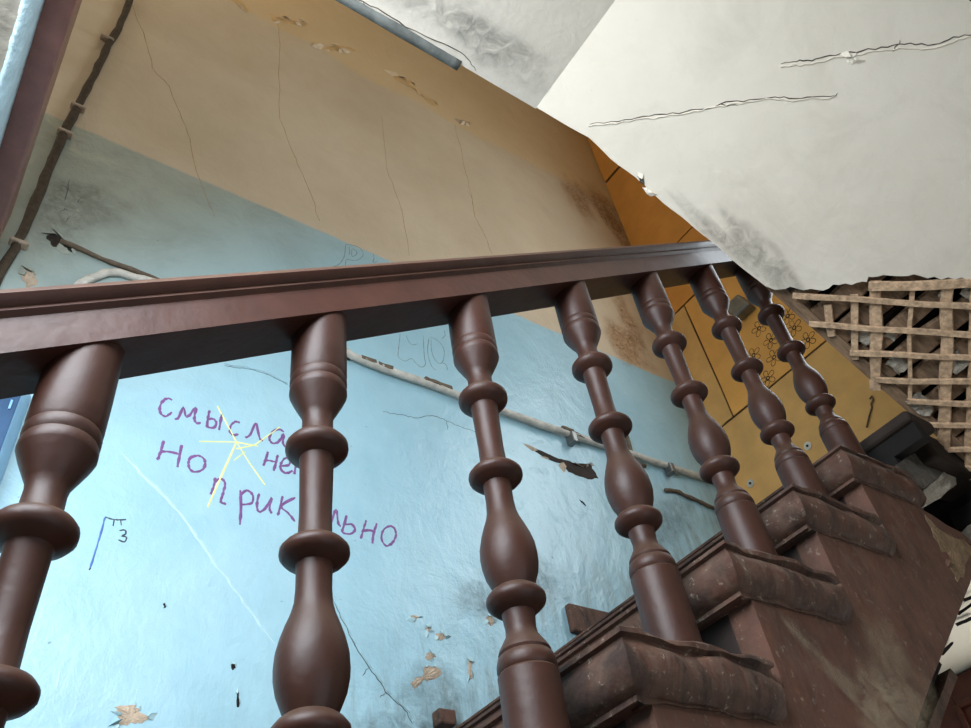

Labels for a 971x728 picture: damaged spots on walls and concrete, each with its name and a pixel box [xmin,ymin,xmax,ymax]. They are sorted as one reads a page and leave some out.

crack [780,34,971,68]
crack [133,8,215,215]
crack [591,94,837,126]
spalling [791,274,971,480]
spalling [524,444,598,480]
spalling [895,453,971,582]
crack [333,596,414,722]
spalling [407,615,451,689]
spalling [466,657,475,683]